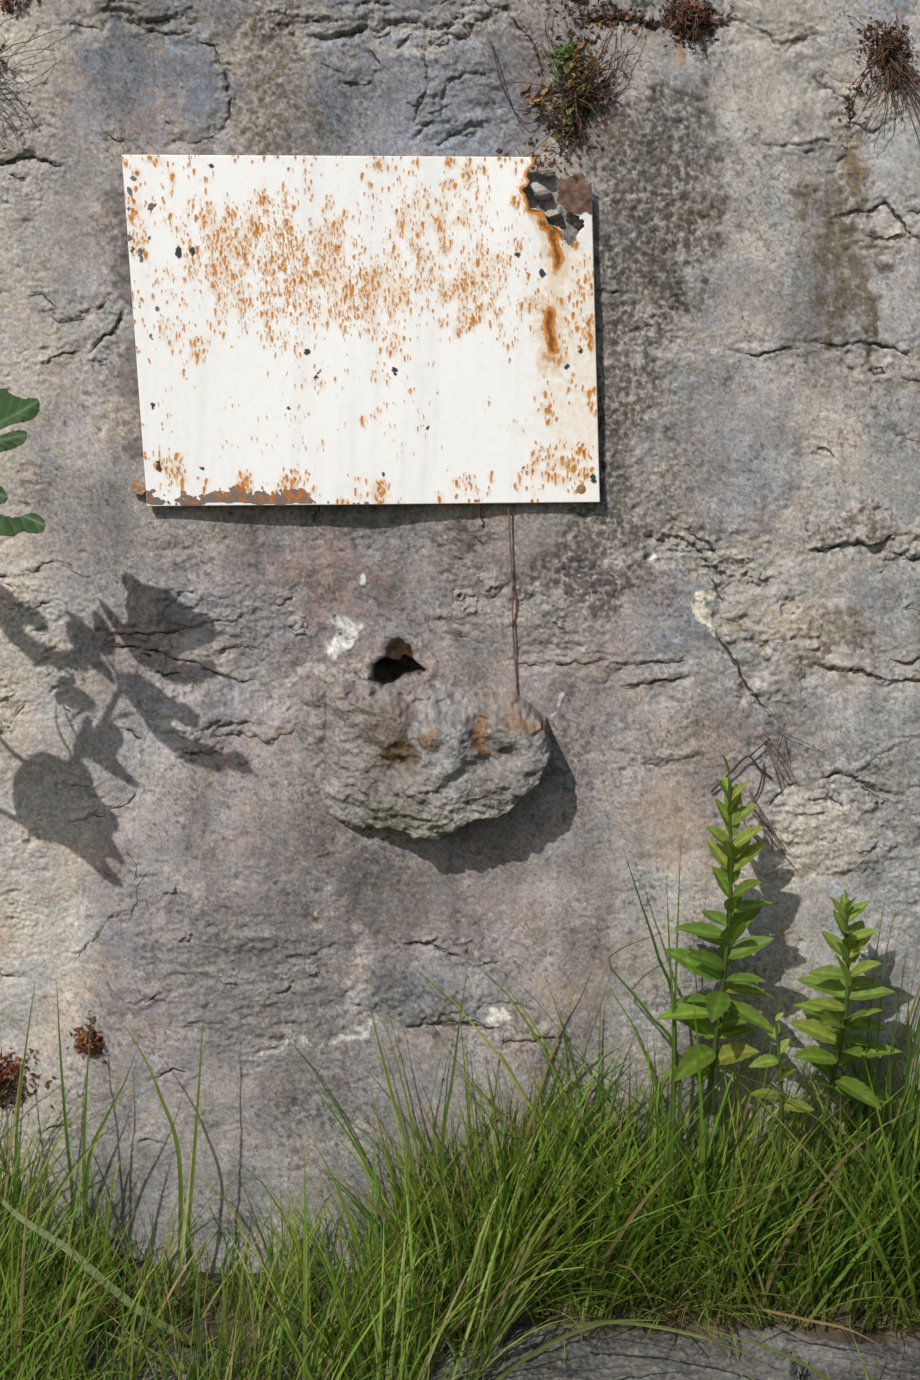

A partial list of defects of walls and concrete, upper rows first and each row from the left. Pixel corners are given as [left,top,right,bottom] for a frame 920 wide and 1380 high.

crack [69,0,232,143]
rust [122,155,597,435]
crack [732,341,920,381]
rust [144,448,207,506]
rust [275,437,324,496]
rust [336,474,401,505]
rust [438,471,493,504]
rust [513,421,594,503]
crack [644,533,750,600]
crack [518,659,687,689]
crack [715,633,796,722]
crack [818,657,920,682]